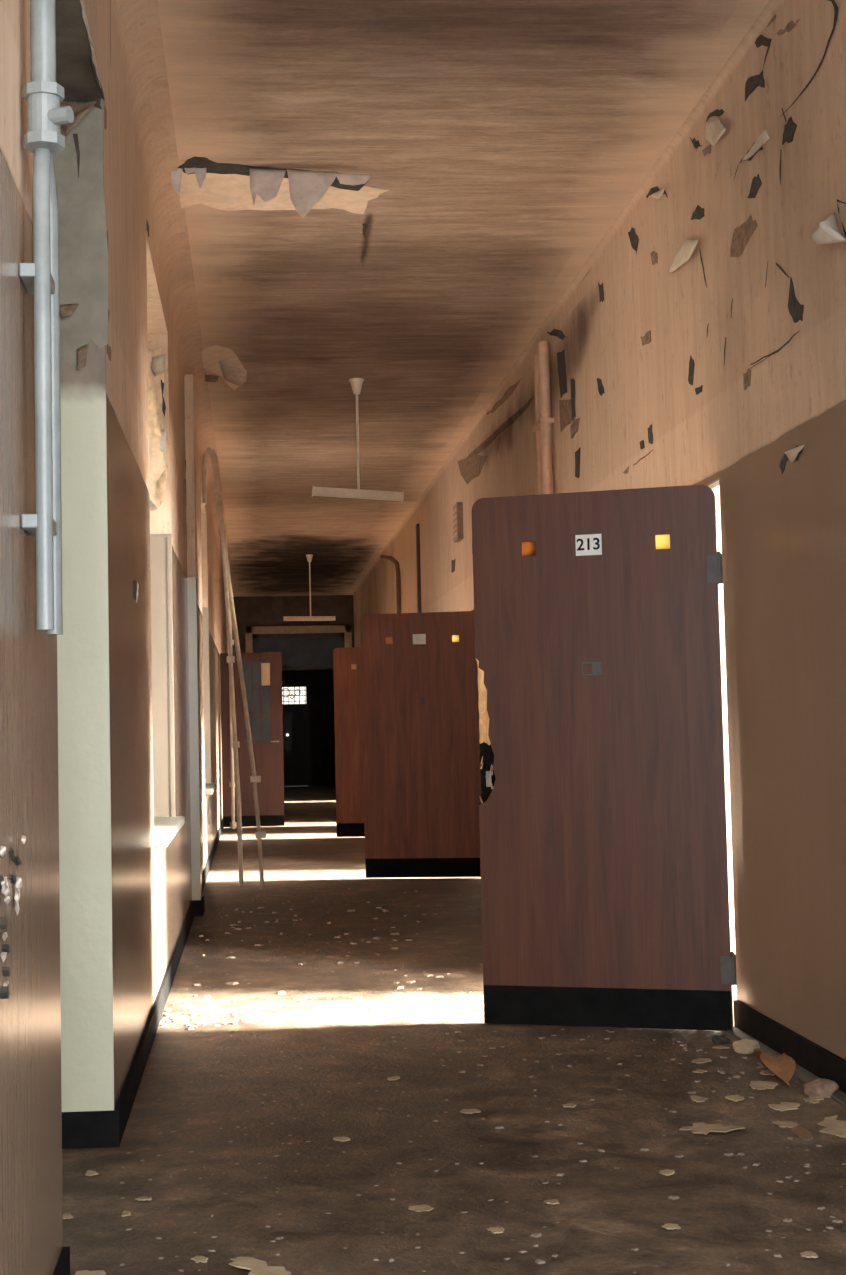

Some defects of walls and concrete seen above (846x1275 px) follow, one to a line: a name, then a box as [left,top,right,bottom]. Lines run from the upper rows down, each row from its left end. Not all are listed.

peeling [745,14,800,101]
crack [781,0,839,116]
peeling [733,108,797,185]
peeling [171,156,389,240]
peeling [628,228,698,273]
peeling [765,262,804,323]
peeling [810,199,846,244]
peeling [148,349,167,511]
flaking render [457,396,534,485]
flaking render [547,329,580,478]
peeling [623,424,654,474]
peeling [688,355,703,395]